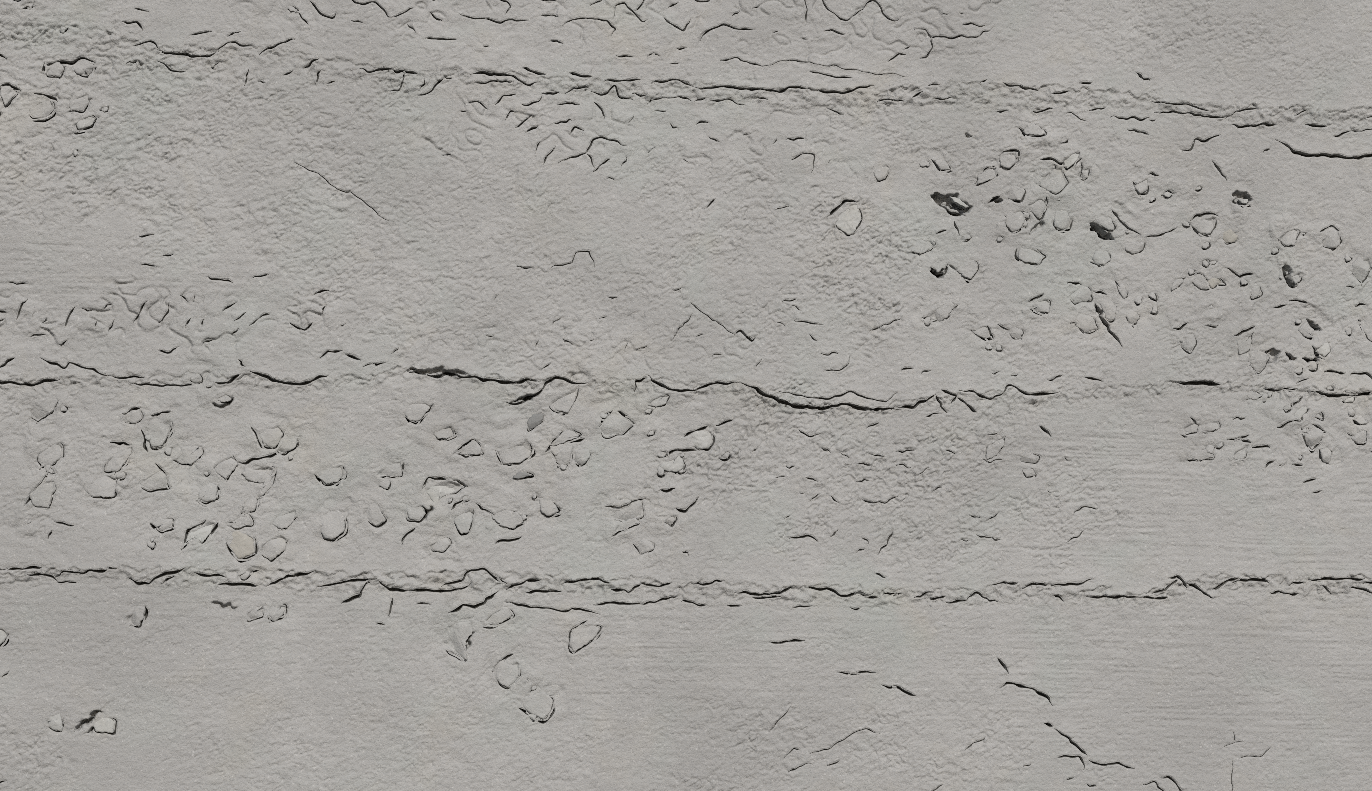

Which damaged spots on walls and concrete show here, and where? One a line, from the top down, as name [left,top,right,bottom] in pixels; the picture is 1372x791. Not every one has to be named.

crack [122,0,992,181]
crack [294,161,389,221]
crack [828,173,889,238]
crack [138,233,173,268]
crack [981,72,1372,409]
crack [0,250,1103,543]
crack [0,635,10,678]
crack [997,658,1183,791]
crack [1224,732,1271,791]